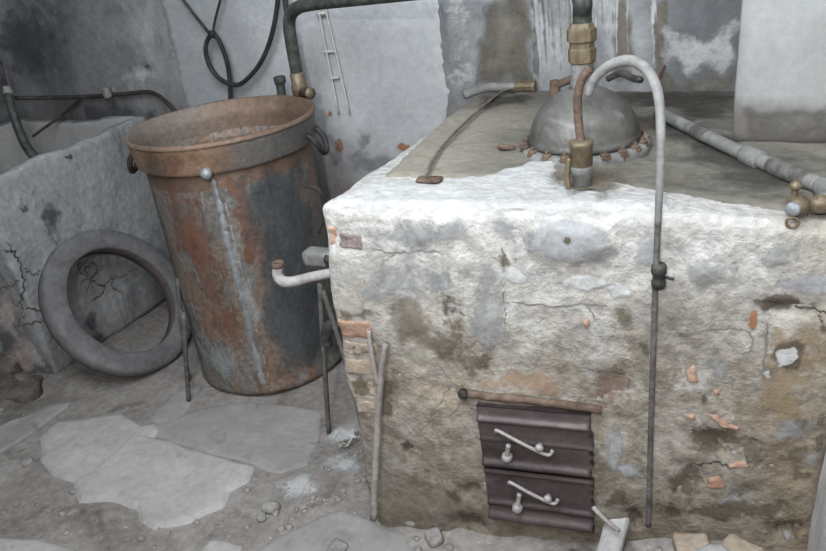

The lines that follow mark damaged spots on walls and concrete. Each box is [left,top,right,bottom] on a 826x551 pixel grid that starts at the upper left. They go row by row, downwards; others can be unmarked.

leakage [445,0,549,86]
leakage [603,0,633,57]
leakage [651,0,730,117]
peeling [662,20,738,76]
leakage [485,95,527,106]
leakage [629,92,654,105]
crack [77,260,138,303]
peeling [331,257,363,315]
crack [794,305,826,323]
peeling [769,347,798,367]